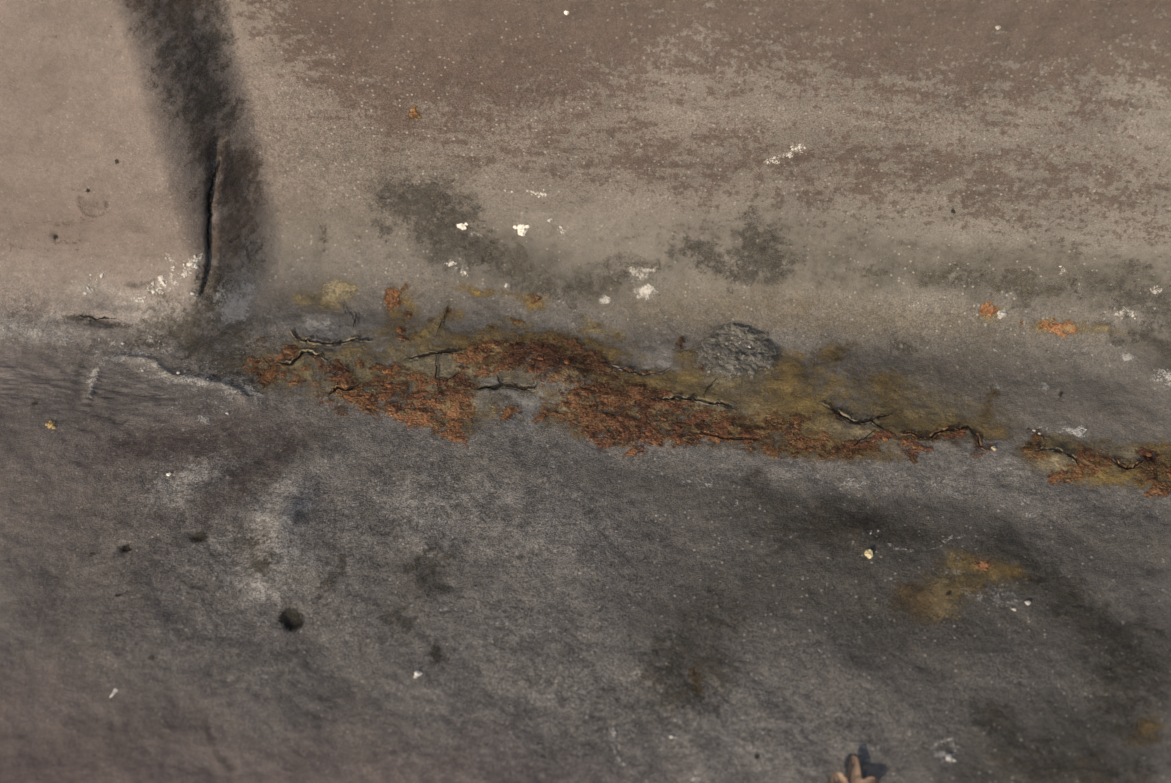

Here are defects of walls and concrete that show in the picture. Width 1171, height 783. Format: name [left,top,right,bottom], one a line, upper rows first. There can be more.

water stain [65,0,318,510]
crack [205,160,219,264]
rust [293,280,359,311]
water stain [374,170,804,310]
crack [272,306,373,396]
crack [403,302,767,440]
rust [233,285,1171,498]
crack [820,401,989,451]
crack [1037,446,1079,465]
crack [1112,457,1143,471]
rust [937,551,1030,584]